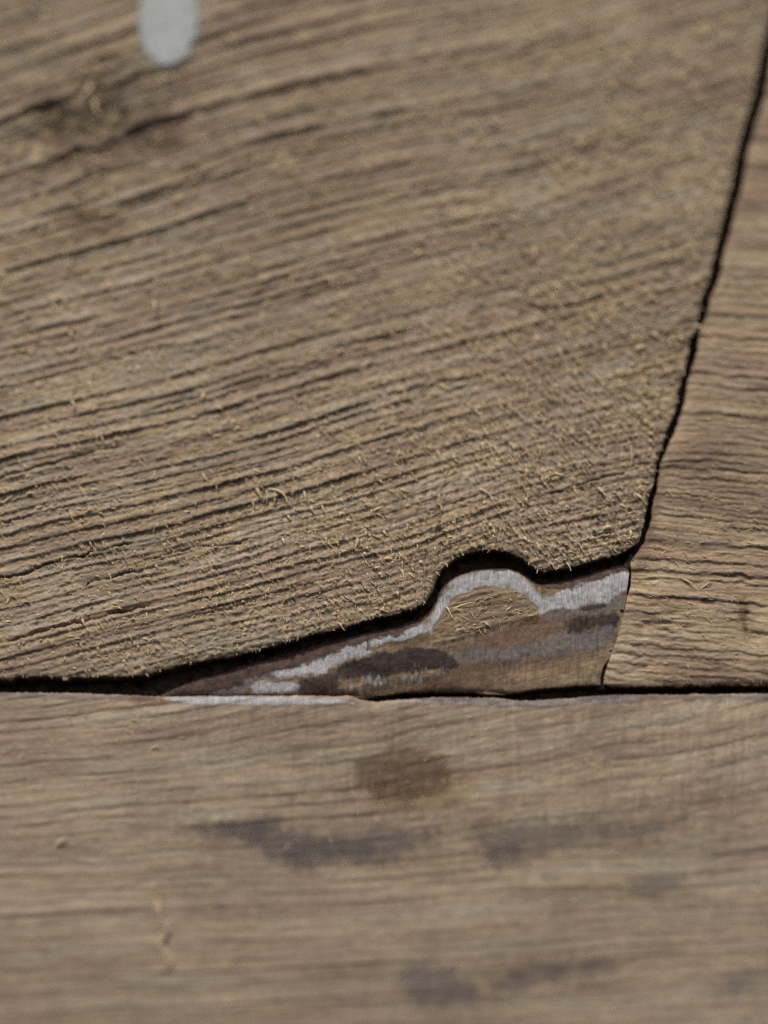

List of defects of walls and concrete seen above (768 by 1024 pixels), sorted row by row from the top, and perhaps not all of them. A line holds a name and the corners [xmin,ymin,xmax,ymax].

crack [0,27,768,702]
peeling [165,570,629,706]